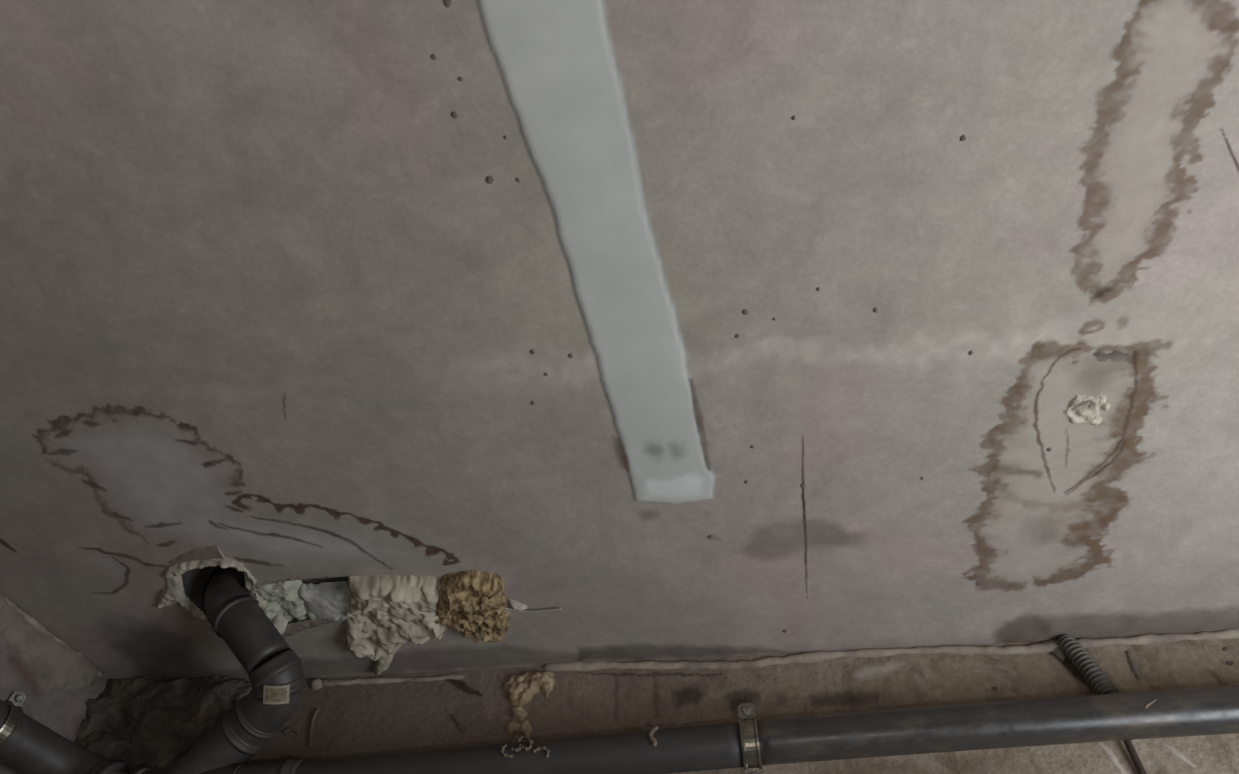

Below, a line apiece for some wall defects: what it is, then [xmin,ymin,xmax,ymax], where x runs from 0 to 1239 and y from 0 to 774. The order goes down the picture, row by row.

damp [1108,36,1131,92]
damp [1185,62,1229,125]
damp [1129,160,1196,267]
damp [1005,342,1117,445]
spalling [1063,391,1111,425]
damp [178,423,460,566]
crack [800,442,808,580]
damp [965,424,1007,586]
damp [1036,351,1156,586]
spalling [157,544,354,638]